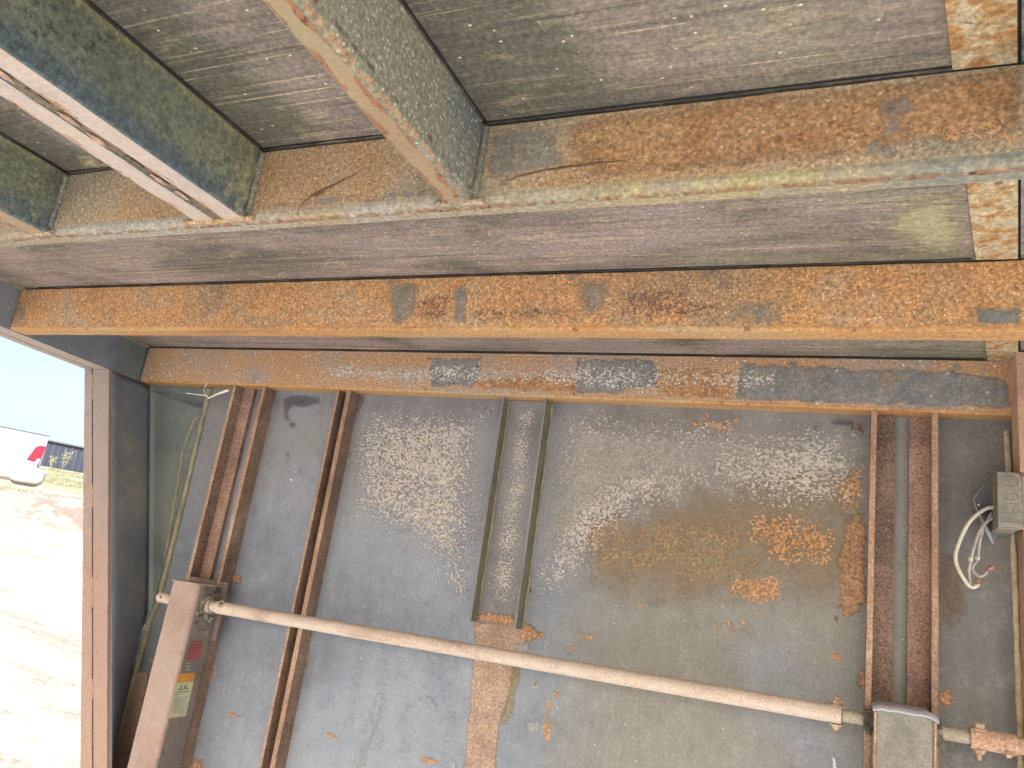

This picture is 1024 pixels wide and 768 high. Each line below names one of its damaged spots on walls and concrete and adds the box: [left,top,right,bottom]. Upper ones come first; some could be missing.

corrosion [569,68,1019,175]
damp [285,397,315,426]
corrosion [477,377,576,391]
corrosion [656,368,732,399]
damp [347,404,495,601]
damp [532,406,865,603]
corrosion [579,465,867,632]